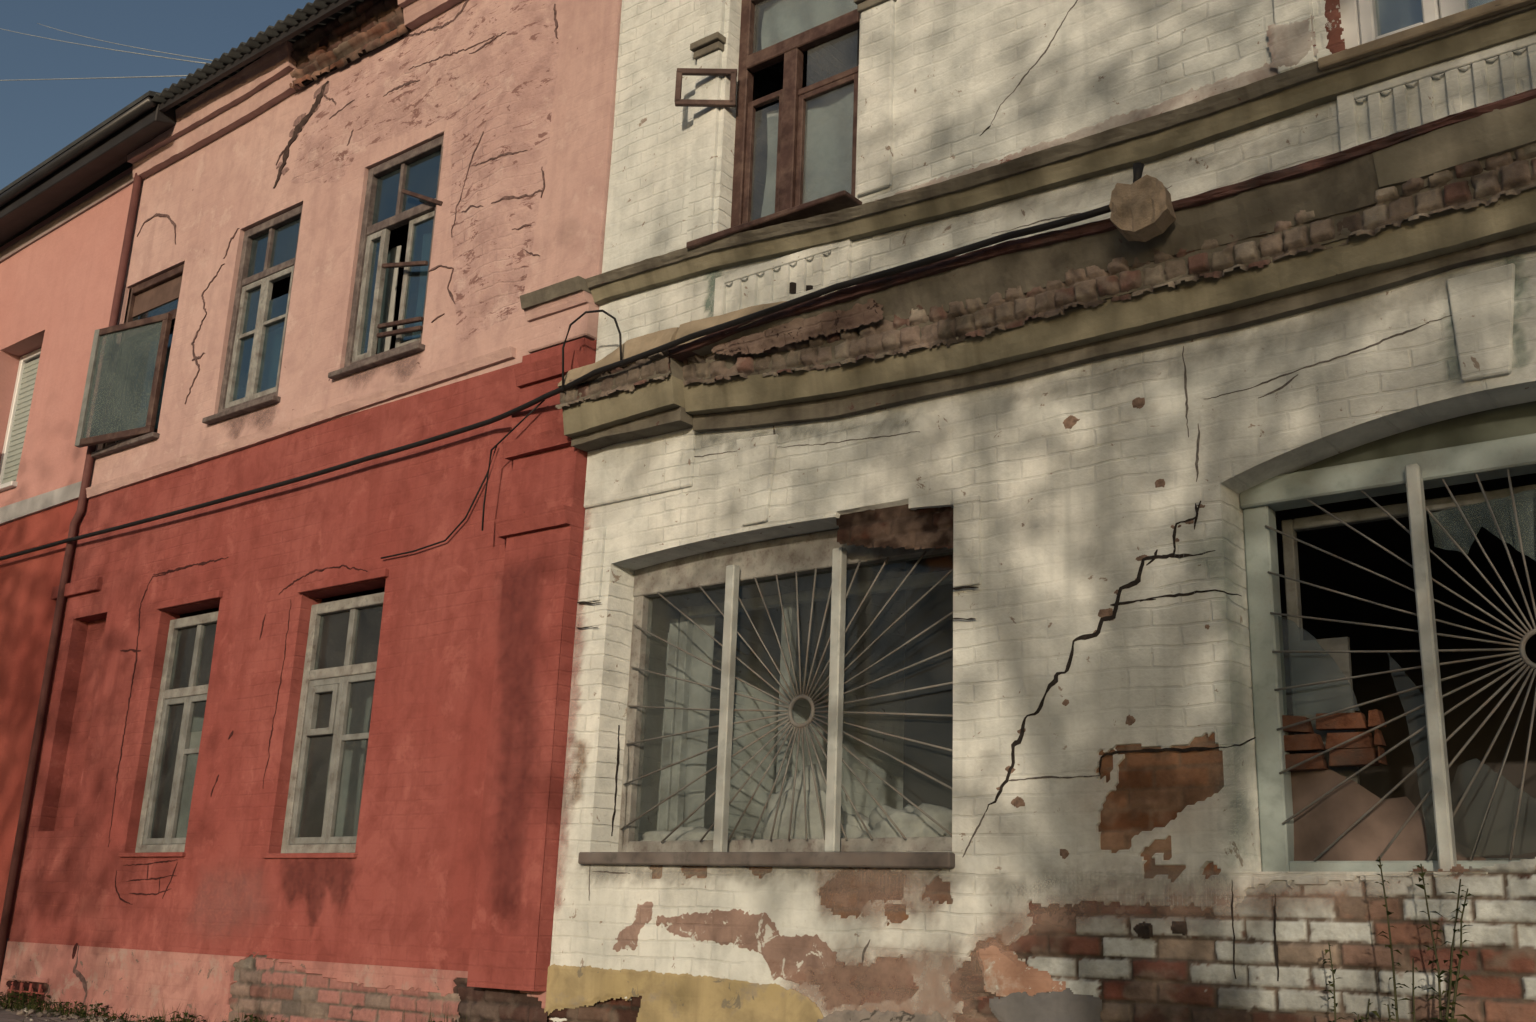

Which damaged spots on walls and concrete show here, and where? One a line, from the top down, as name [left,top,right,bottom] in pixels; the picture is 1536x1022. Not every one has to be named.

crack [273,0,507,189]
crack [980,0,1078,136]
peeling [875,0,1346,201]
crack [185,228,240,404]
crack [428,131,545,323]
spalling [555,149,1536,409]
crack [951,586,979,620]
crack [963,315,1452,857]
peeling [1096,715,1224,882]
spalling [228,952,642,1022]
peeling [613,901,919,1005]
spalling [950,857,1536,1022]